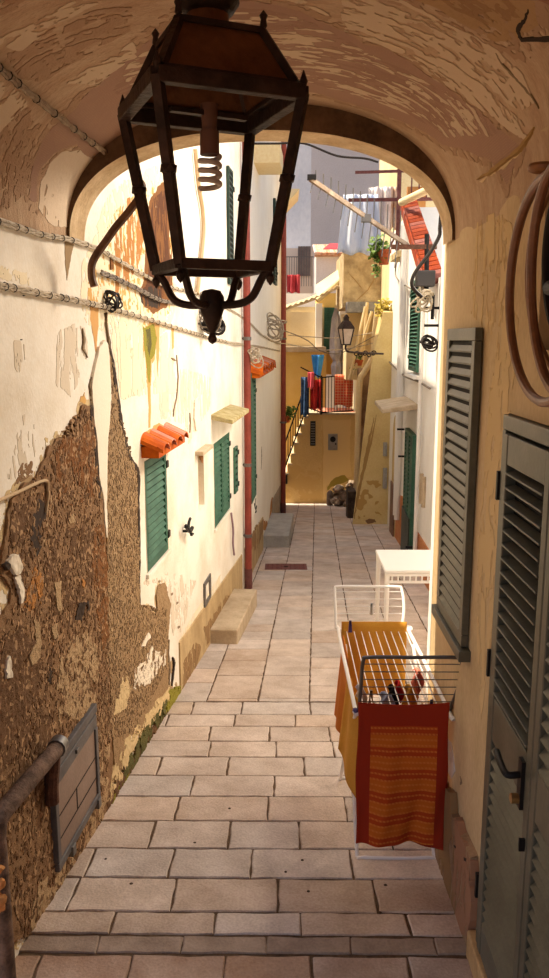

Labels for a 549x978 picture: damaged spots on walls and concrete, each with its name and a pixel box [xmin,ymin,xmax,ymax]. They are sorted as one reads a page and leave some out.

spalling [387,0,549,62]
spalling [0,326,180,950]